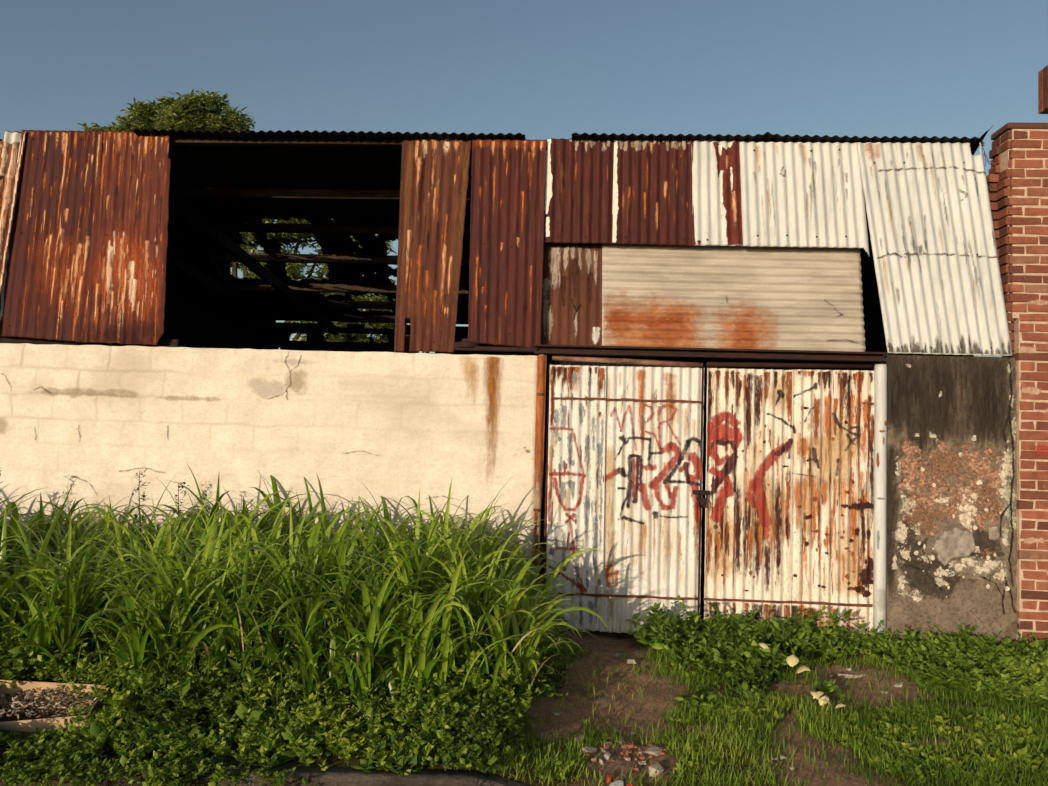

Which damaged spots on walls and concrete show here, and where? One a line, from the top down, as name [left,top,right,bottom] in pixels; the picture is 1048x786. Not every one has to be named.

rust [27,131,169,343]
rust [402,139,543,342]
rust [623,142,693,239]
rust [713,142,743,245]
rust [607,303,699,348]
rust [723,310,772,349]
rust [466,357,499,441]
damp [883,336,1013,462]
damp [886,448,974,600]
spalling [891,387,1044,605]
damp [968,529,1004,560]